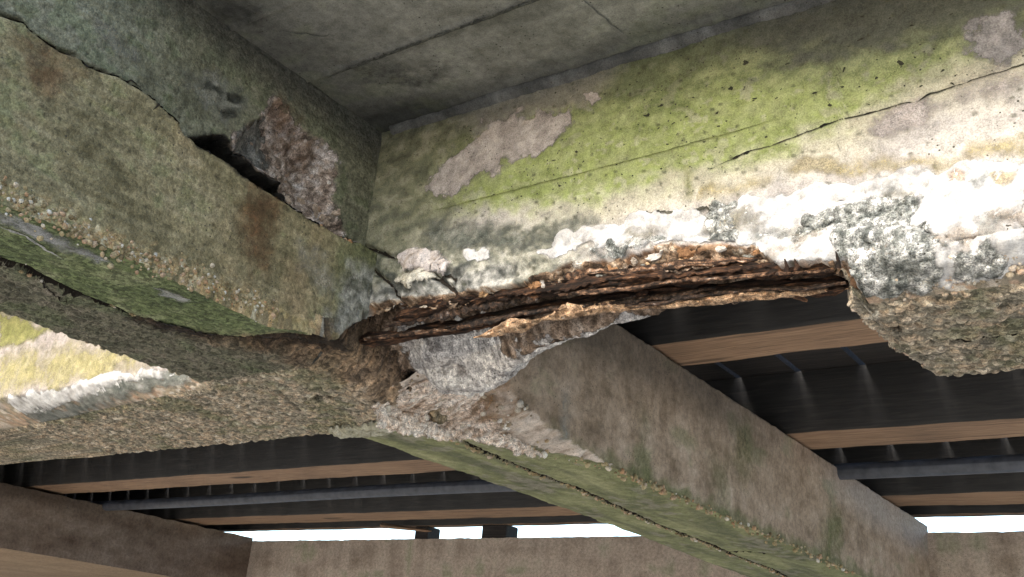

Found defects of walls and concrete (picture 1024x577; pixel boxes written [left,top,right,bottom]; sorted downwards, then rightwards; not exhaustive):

crack [3,17,180,124]
spalling [195,73,360,243]
peeling [425,106,572,197]
crack [708,63,1024,169]
rust [133,315,212,339]
crack [256,186,405,303]
rust [235,255,849,352]
damp [425,142,1024,289]
spalling [828,251,864,323]
spalling [931,255,1024,297]
spalling [326,242,855,575]
crack [449,438,787,577]